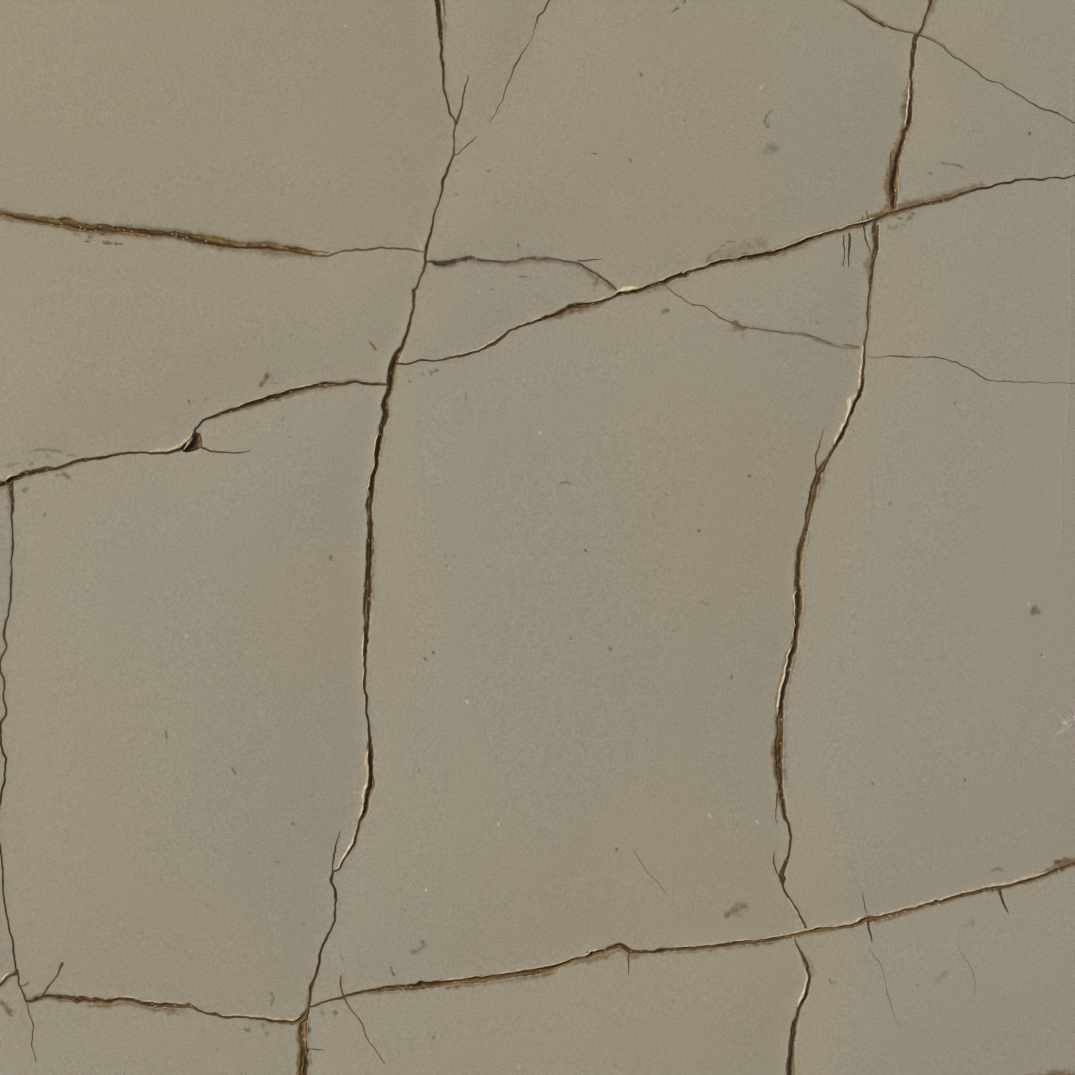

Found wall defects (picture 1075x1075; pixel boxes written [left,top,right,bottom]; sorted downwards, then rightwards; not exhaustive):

crack [844,0,1075,209]
crack [396,174,1075,365]
crack [0,0,617,1006]
crack [308,224,1075,1075]
crack [0,844,323,1075]